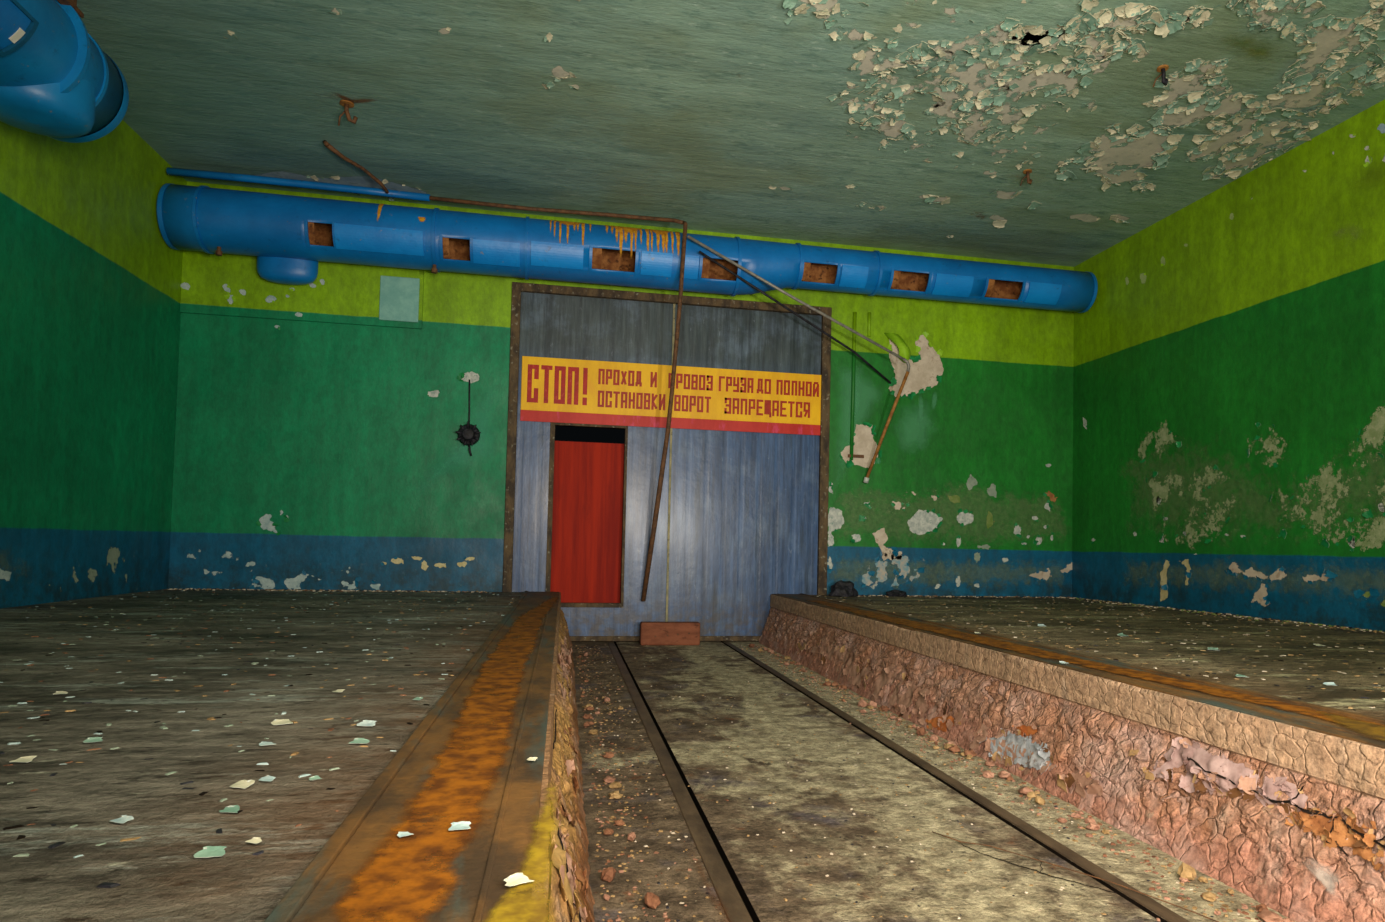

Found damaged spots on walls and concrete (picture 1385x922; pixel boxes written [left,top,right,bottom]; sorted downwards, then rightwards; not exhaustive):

peeling [782,0,1385,228]
corrosion [550,220,680,255]
peeling [884,332,944,400]
peeling [840,422,882,468]
flaking render [891,474,1008,563]
peeling [1138,421,1246,601]
peeling [1269,406,1385,552]
peeling [187,549,322,590]
peeling [1224,562,1338,607]
crack [551,709,559,749]
crack [1188,758,1385,857]
crack [548,810,581,922]